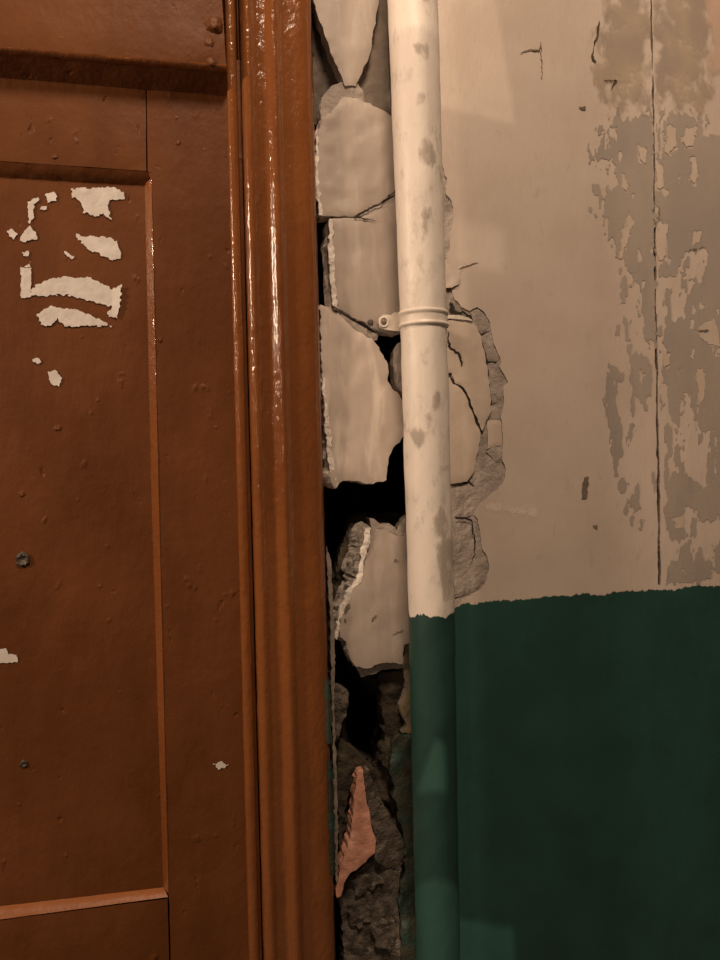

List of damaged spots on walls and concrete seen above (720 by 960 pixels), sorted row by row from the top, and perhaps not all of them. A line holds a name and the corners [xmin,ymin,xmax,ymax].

flaking render [311,0,392,154]
crack [522,43,543,79]
crack [354,191,395,221]
flaking render [443,173,453,259]
crack [447,302,497,433]
flaking render [446,289,507,607]
peeling [587,107,720,585]
crack [653,349,661,521]
flaking render [316,194,416,960]
crack [456,517,476,563]